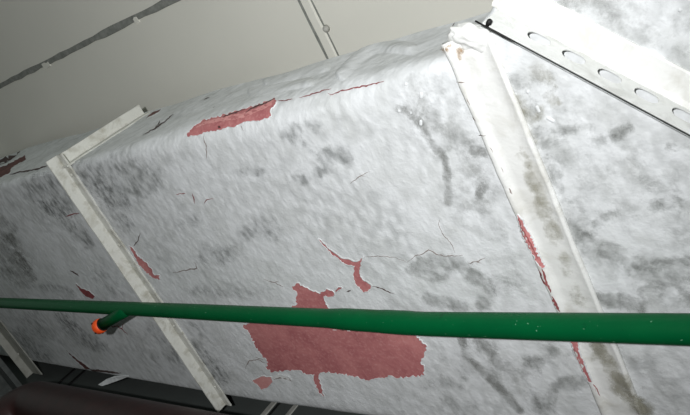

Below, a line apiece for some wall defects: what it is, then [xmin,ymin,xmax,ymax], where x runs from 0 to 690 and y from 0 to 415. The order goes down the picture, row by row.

crack [278,81,384,101]
peeling [187,97,277,137]
peeling [0,151,46,178]
peeling [75,283,95,299]
peeling [128,235,160,280]
peeling [291,238,394,309]
crack [370,220,485,264]
peeling [516,214,560,312]
peeling [243,323,428,397]
peeling [570,342,592,383]